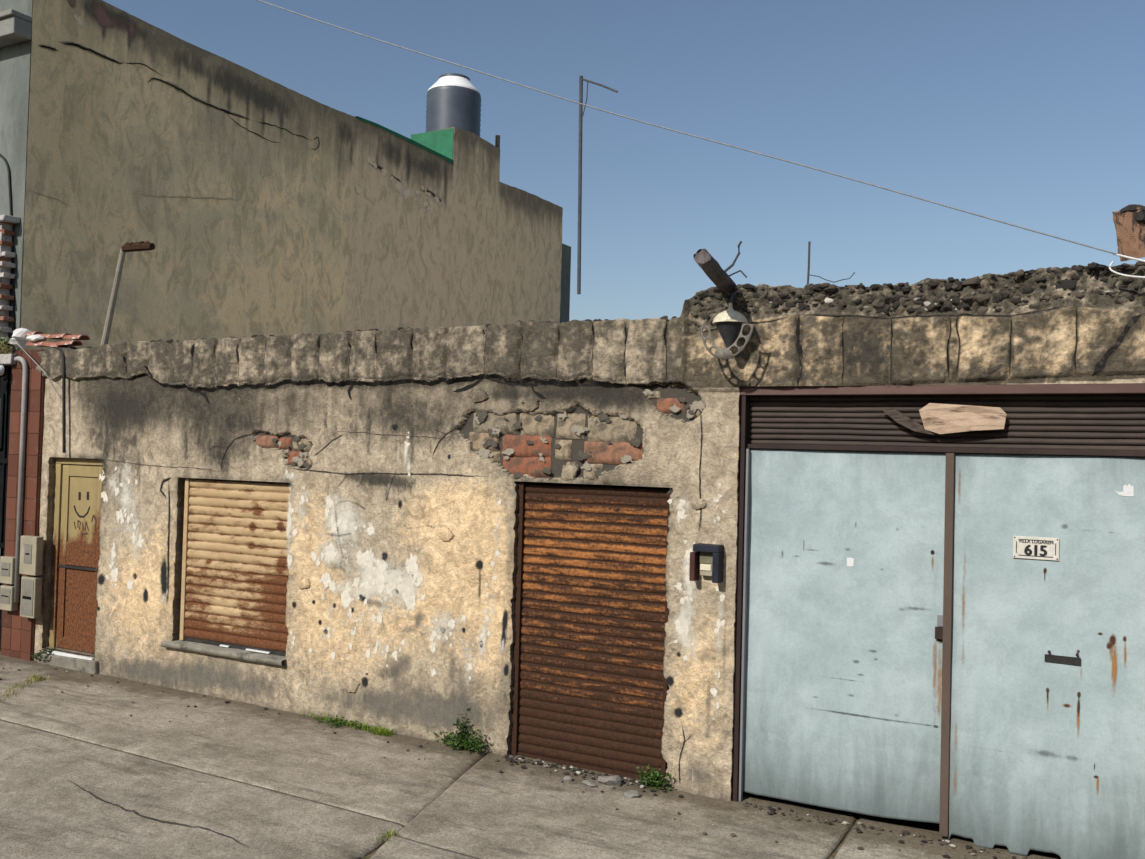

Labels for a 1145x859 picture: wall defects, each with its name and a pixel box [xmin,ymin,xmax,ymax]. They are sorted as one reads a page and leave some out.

crack [38,42,320,150]
leakage [208,74,288,128]
crack [123,322,687,405]
crack [751,306,1145,386]
flaking render [642,382,706,422]
flaking render [254,431,313,538]
crack [284,429,487,500]
flaking render [456,404,644,480]
peeling [311,494,425,661]
peeling [365,638,406,667]
rust [1098,633,1126,683]